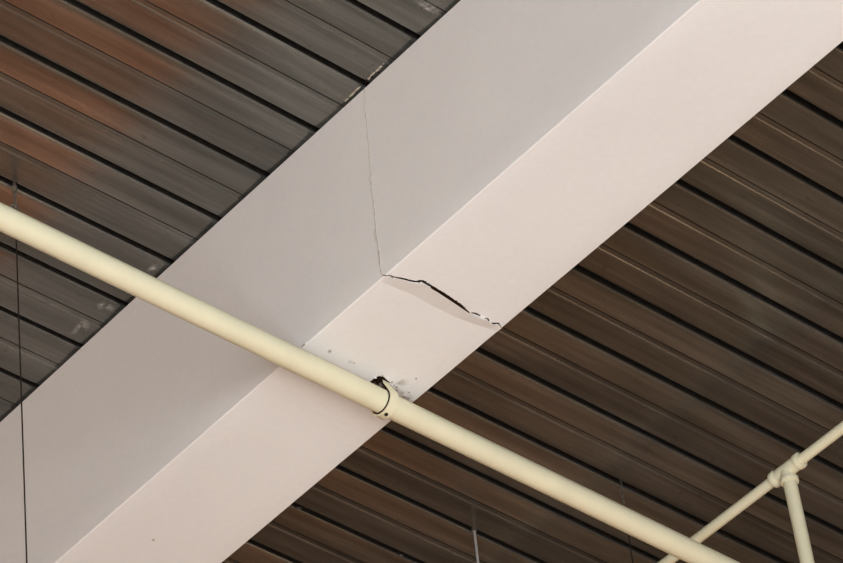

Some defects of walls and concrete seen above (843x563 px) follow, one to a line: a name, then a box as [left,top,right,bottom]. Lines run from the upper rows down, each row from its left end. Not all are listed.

crack [364,88,501,328]